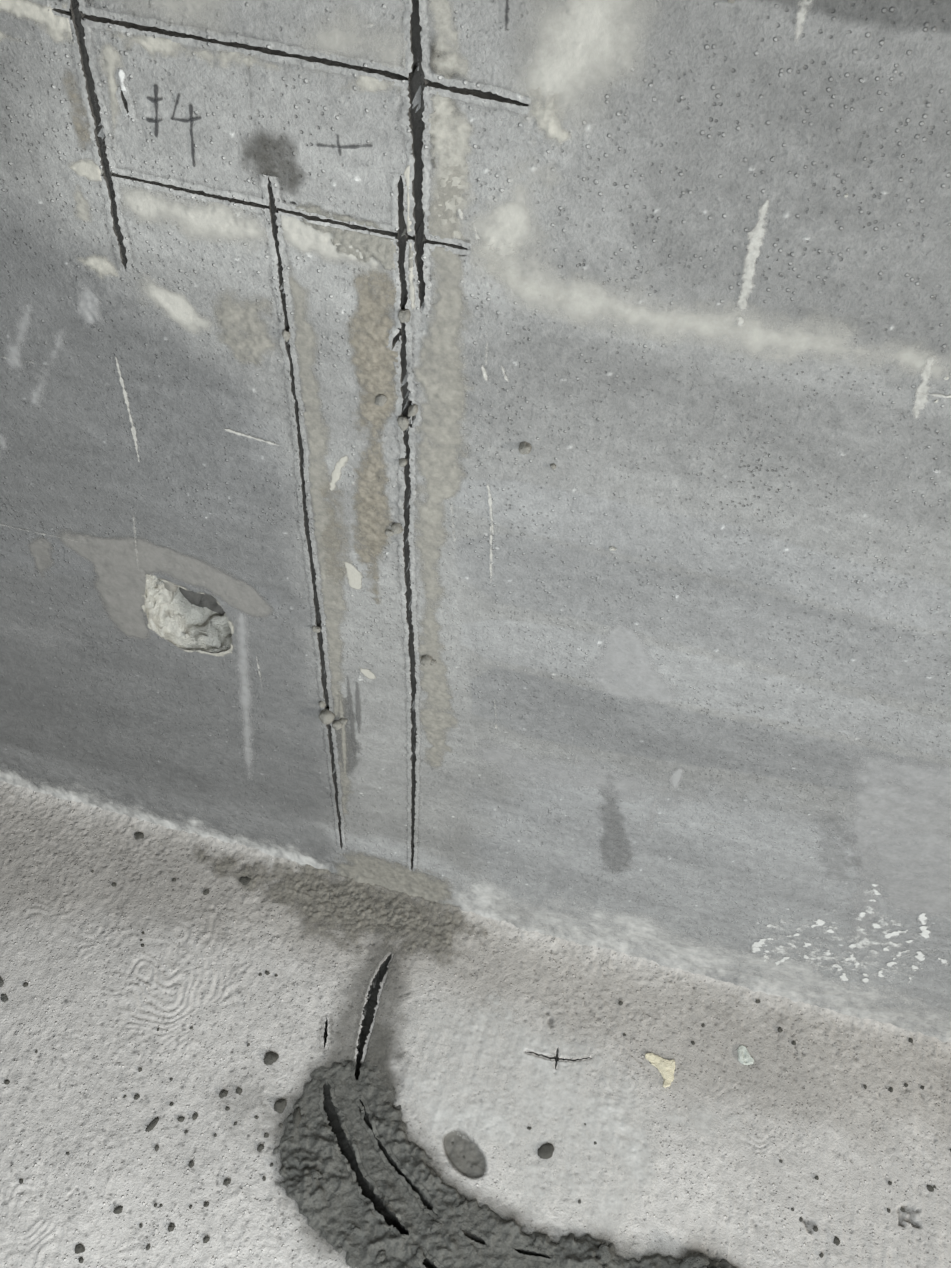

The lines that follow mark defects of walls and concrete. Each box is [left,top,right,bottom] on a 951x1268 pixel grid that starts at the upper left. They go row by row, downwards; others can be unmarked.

crack [47,0,532,872]
spalling [141,574,234,656]
damp [453,883,518,921]
damp [533,912,951,1042]
crack [318,950,553,1268]
crack [524,1044,594,1070]